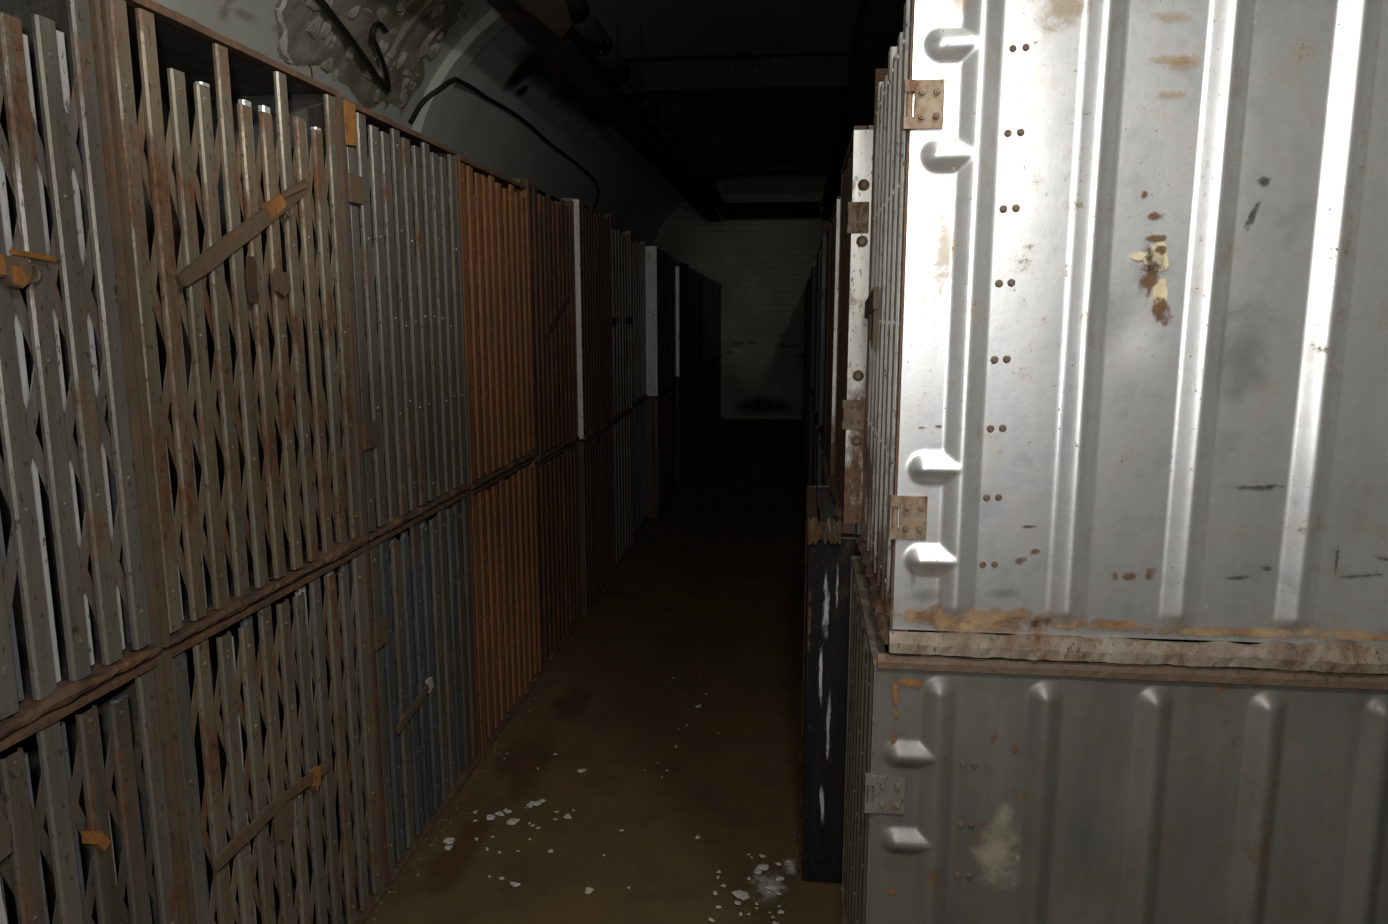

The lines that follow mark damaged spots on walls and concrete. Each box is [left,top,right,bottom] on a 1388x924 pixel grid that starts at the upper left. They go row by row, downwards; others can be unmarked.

flaking render [274,0,469,109]